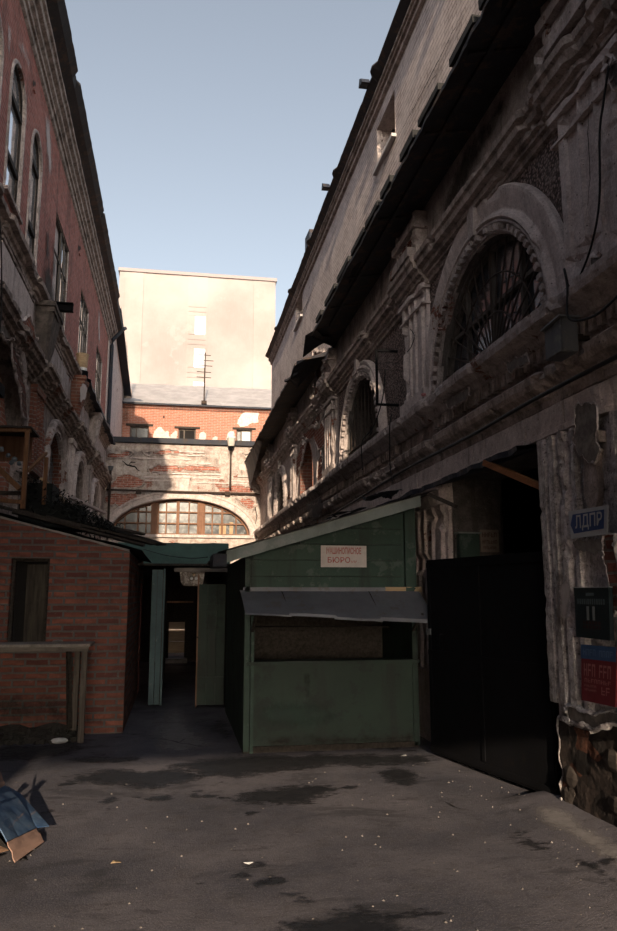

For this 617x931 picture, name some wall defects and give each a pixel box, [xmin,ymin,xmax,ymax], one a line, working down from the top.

spalling [103,447,221,509]
spalling [217,482,258,511]
spalling [600,532,617,618]
damp [0,734,434,816]
damp [280,905,445,931]